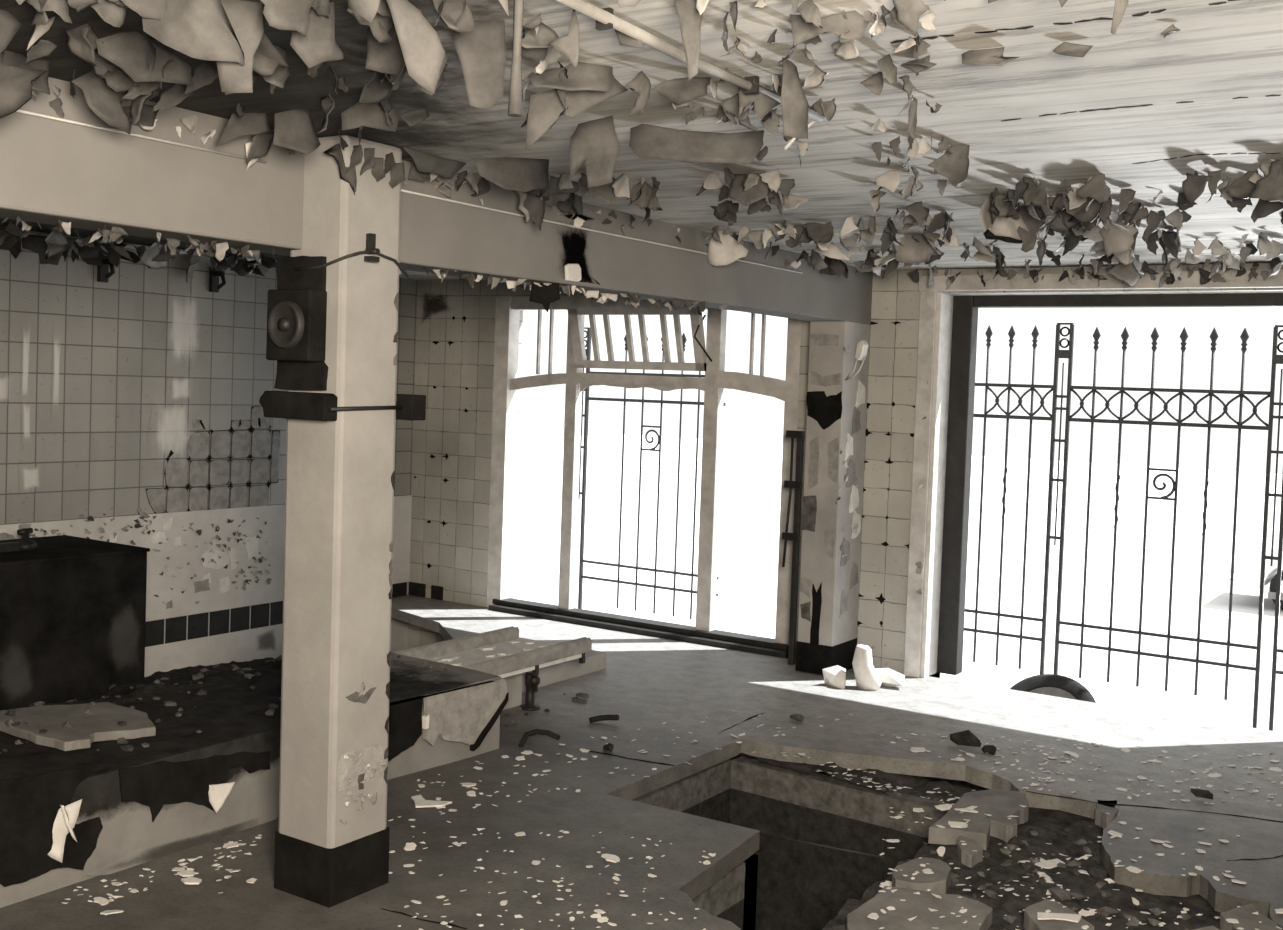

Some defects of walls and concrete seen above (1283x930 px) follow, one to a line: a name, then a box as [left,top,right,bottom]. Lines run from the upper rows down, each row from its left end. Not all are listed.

peeling [0,0,1283,292]
peeling [399,268,728,313]
spalling [0,396,280,609]
peeling [802,370,865,619]
spalling [338,651,509,824]
spalling [633,756,953,930]